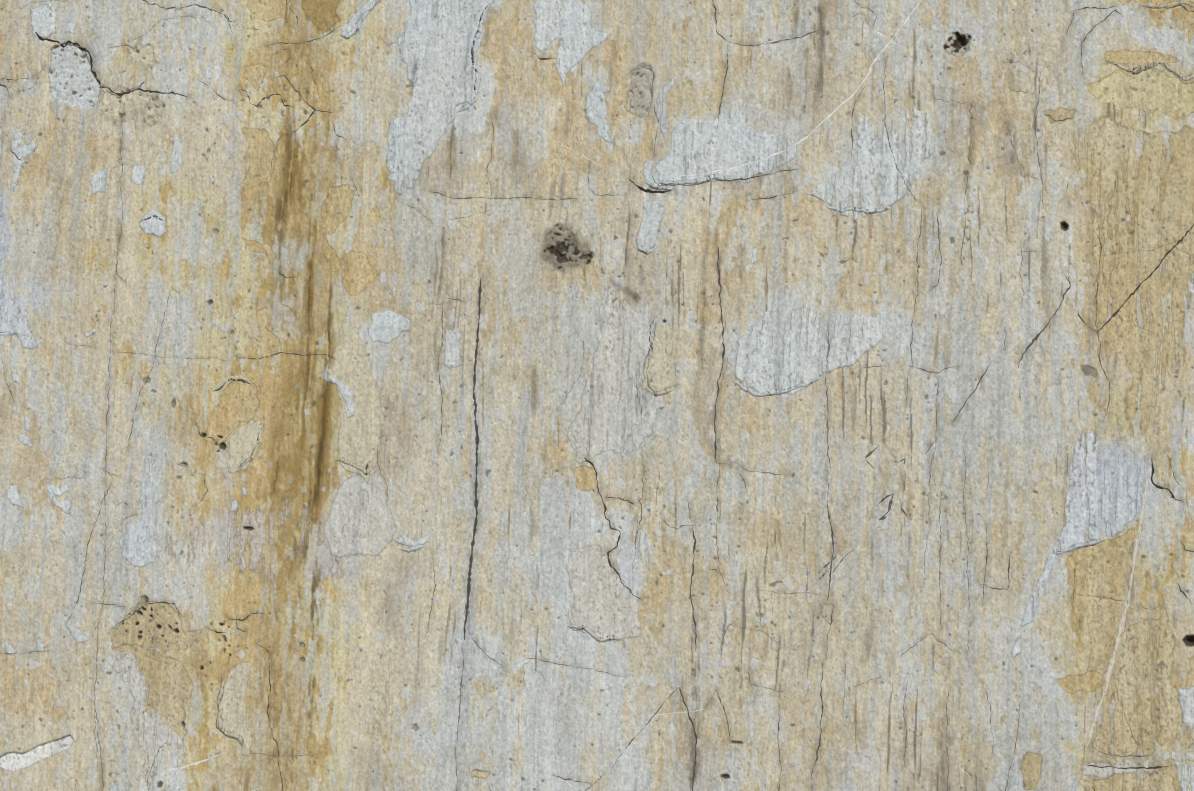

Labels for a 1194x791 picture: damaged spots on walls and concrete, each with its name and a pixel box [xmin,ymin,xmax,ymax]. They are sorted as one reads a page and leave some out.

flaking render [30,1,165,127]
peeling [386,0,493,195]
peeling [627,63,797,191]
crack [712,0,822,128]
peeling [808,109,932,220]
crack [0,0,346,791]
peeling [727,304,881,397]
crack [851,55,1194,765]
peeling [1052,49,1194,791]
crack [433,279,628,791]
crack [584,247,834,791]
crack [1087,685,1172,791]